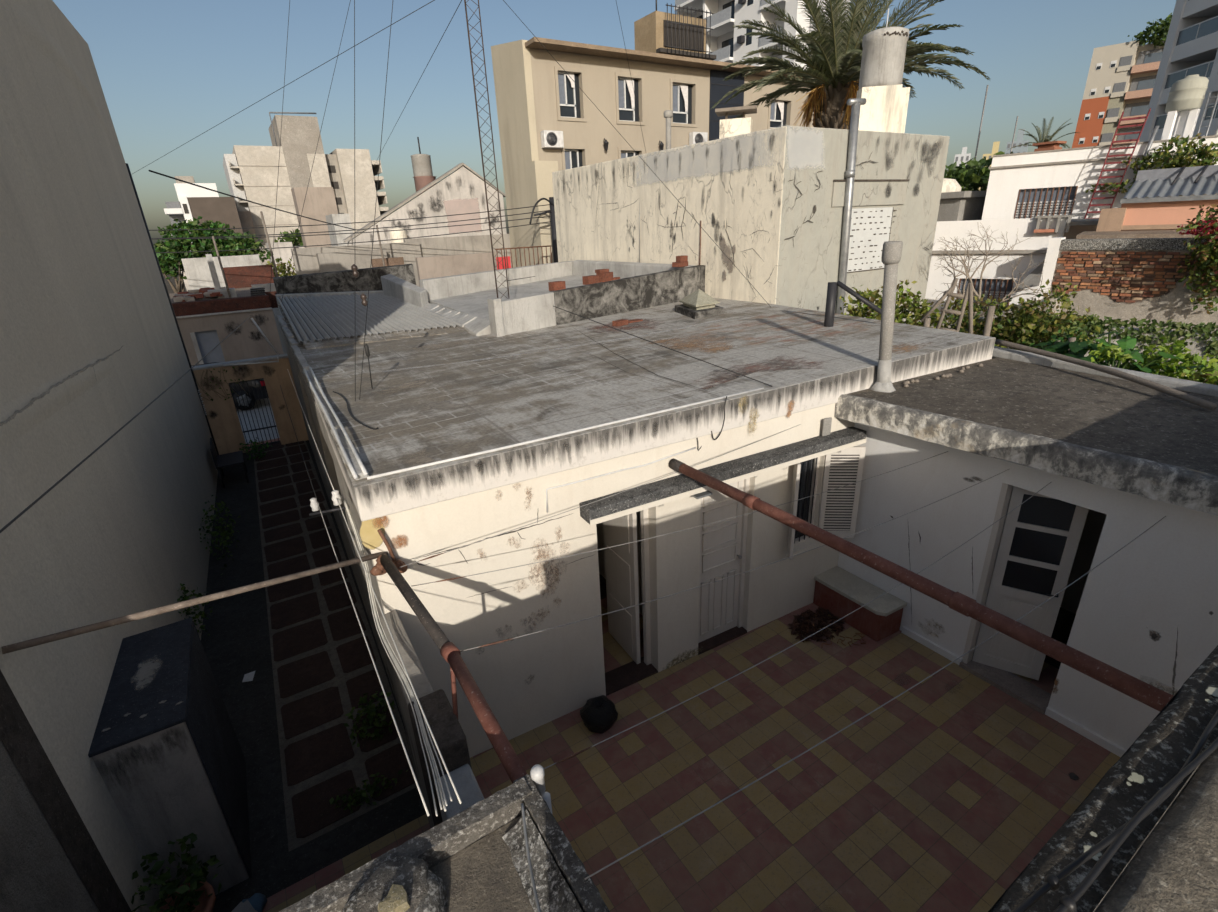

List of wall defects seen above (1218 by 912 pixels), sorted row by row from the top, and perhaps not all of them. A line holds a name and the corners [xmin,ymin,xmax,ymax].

crack [0,348,121,426]
crack [1171,628,1179,696]